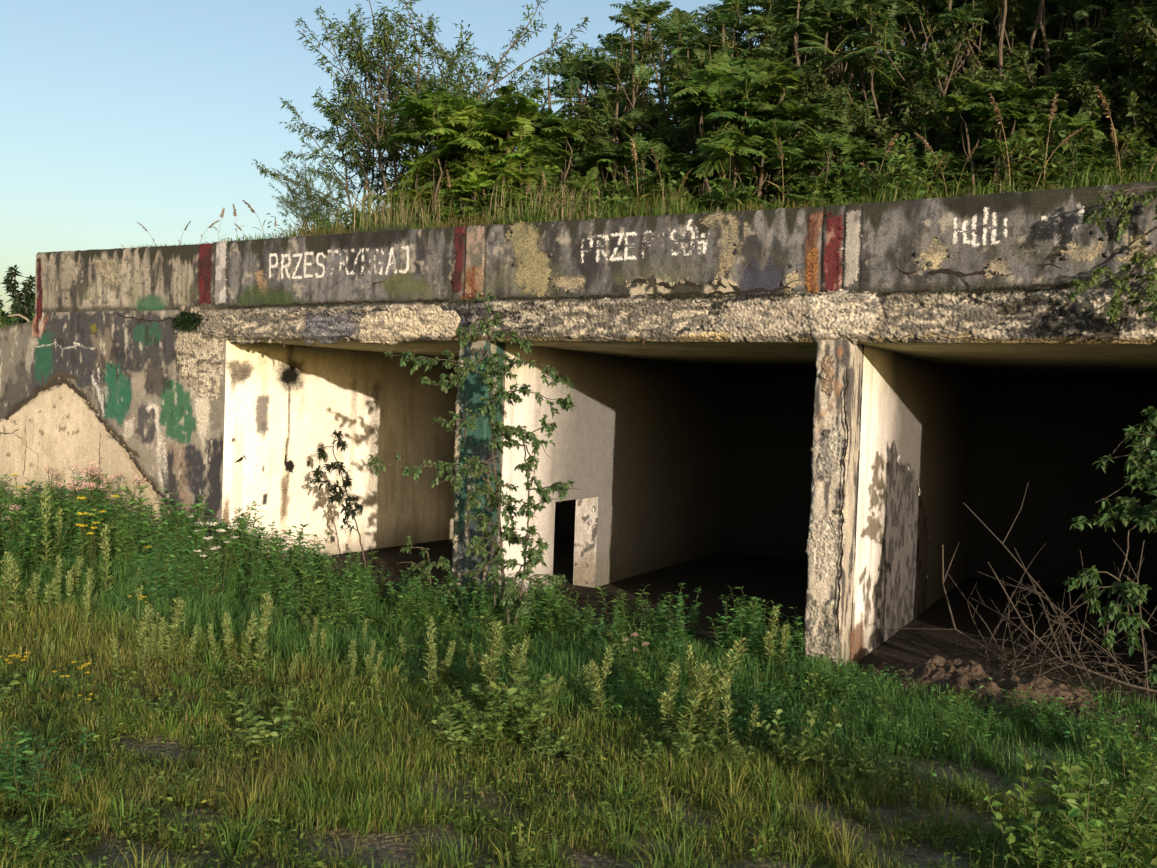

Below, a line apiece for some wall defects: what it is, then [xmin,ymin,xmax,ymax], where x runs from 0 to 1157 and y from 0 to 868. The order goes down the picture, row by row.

peeling [451,225,486,296]
spalling [506,207,1012,345]
spalling [174,240,461,473]
spalling [810,426,848,486]
crack [829,368,849,644]
spalling [805,508,846,583]
spalling [804,599,840,663]